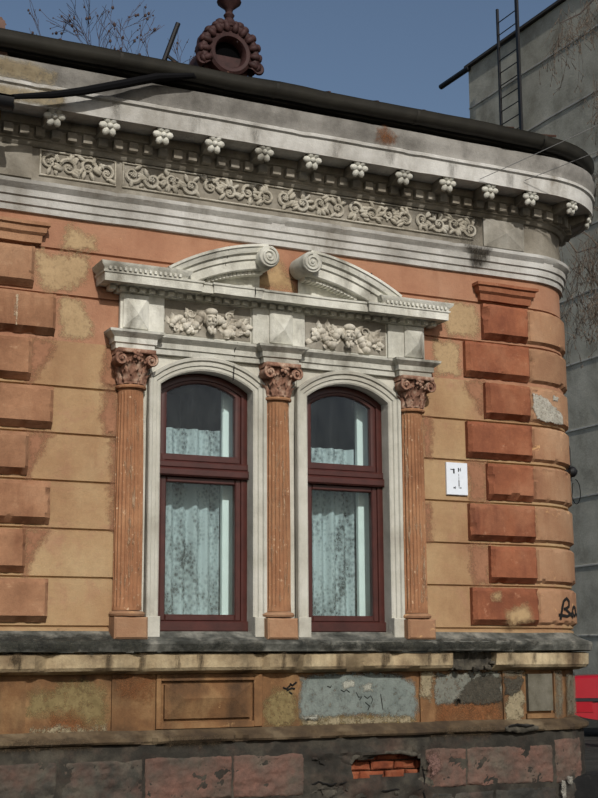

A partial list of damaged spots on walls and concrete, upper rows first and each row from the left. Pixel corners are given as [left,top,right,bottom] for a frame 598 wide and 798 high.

flaking render [533,393,563,425]
flaking render [263,672,418,727]
flaking render [434,670,526,720]
flaking render [312,745,443,798]